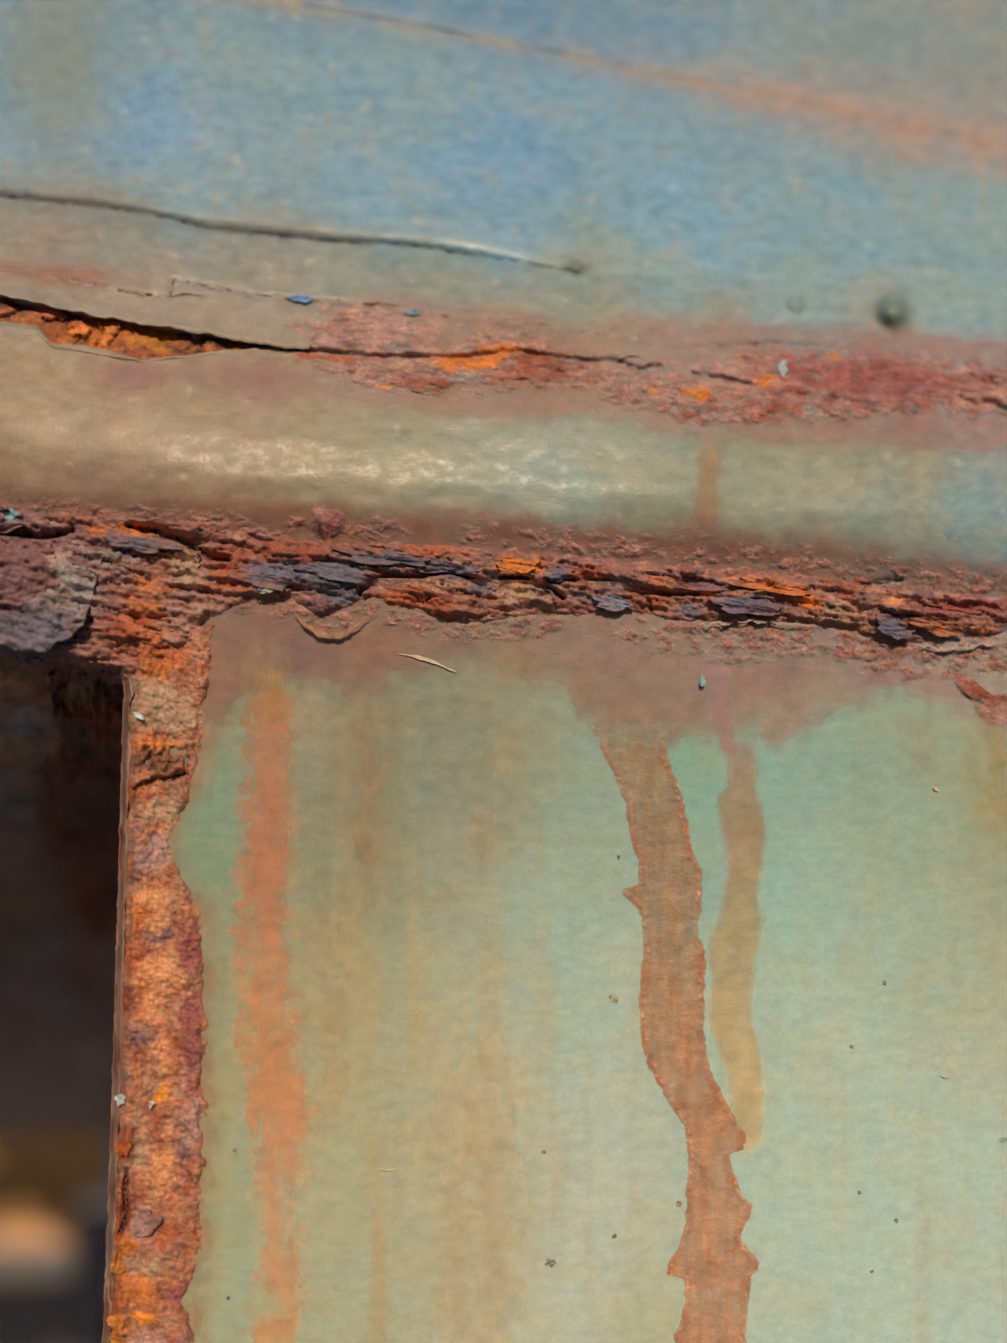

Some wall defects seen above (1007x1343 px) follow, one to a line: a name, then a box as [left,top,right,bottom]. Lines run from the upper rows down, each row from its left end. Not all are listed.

crack [0,196,558,270]
peeling [0,281,314,363]
crack [494,320,645,369]
corrosion [0,298,1007,607]
peeling [0,499,19,522]
peeling [102,534,184,554]
peeling [227,544,576,594]
peeling [294,612,370,638]
corrosion [36,589,1007,1343]